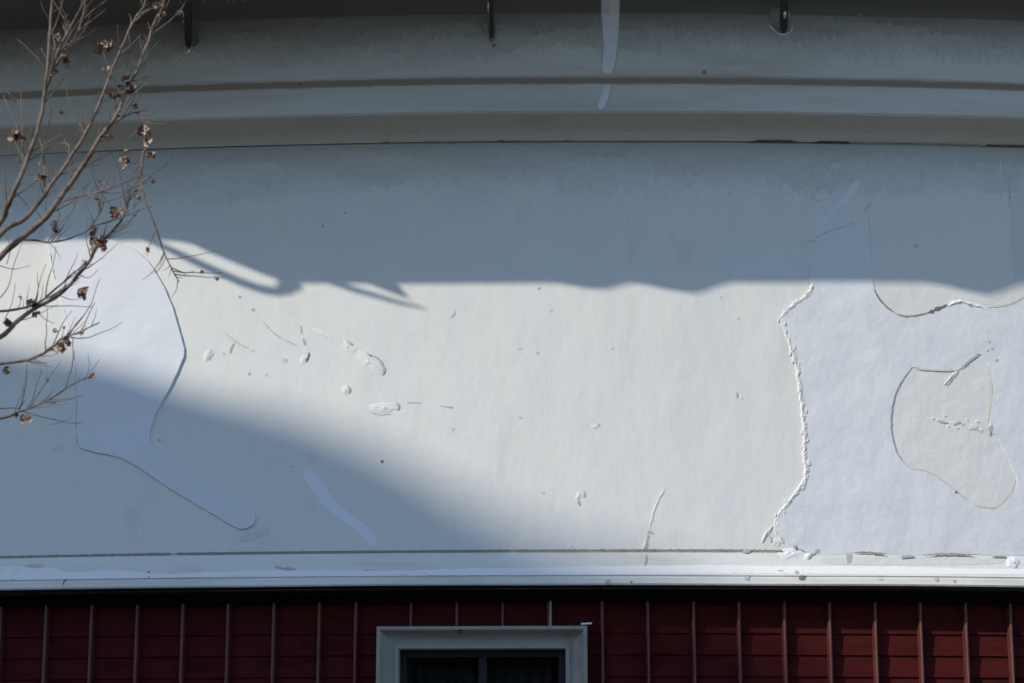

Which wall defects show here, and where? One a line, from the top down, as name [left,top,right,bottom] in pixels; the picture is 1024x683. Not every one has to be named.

spalling [868,193,1024,316]
spalling [762,282,814,549]
spalling [891,355,1017,509]